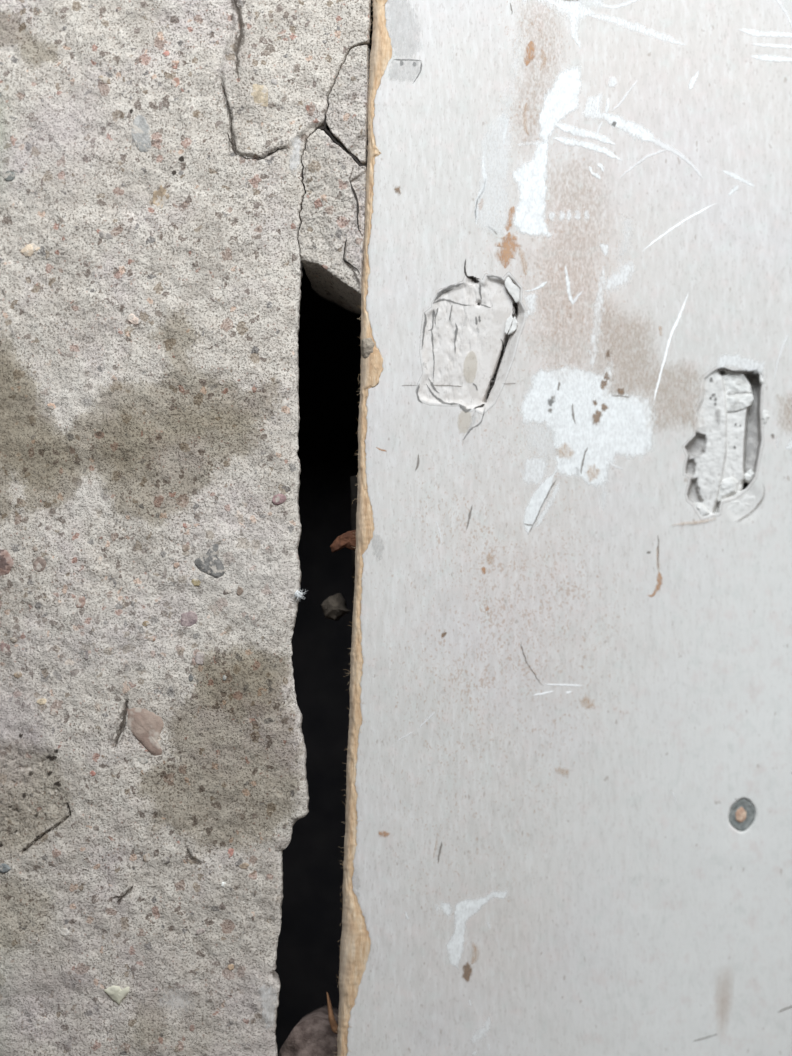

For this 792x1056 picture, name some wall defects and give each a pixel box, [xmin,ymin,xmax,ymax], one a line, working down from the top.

crack [221,0,368,276]
spalling [682,366,769,522]